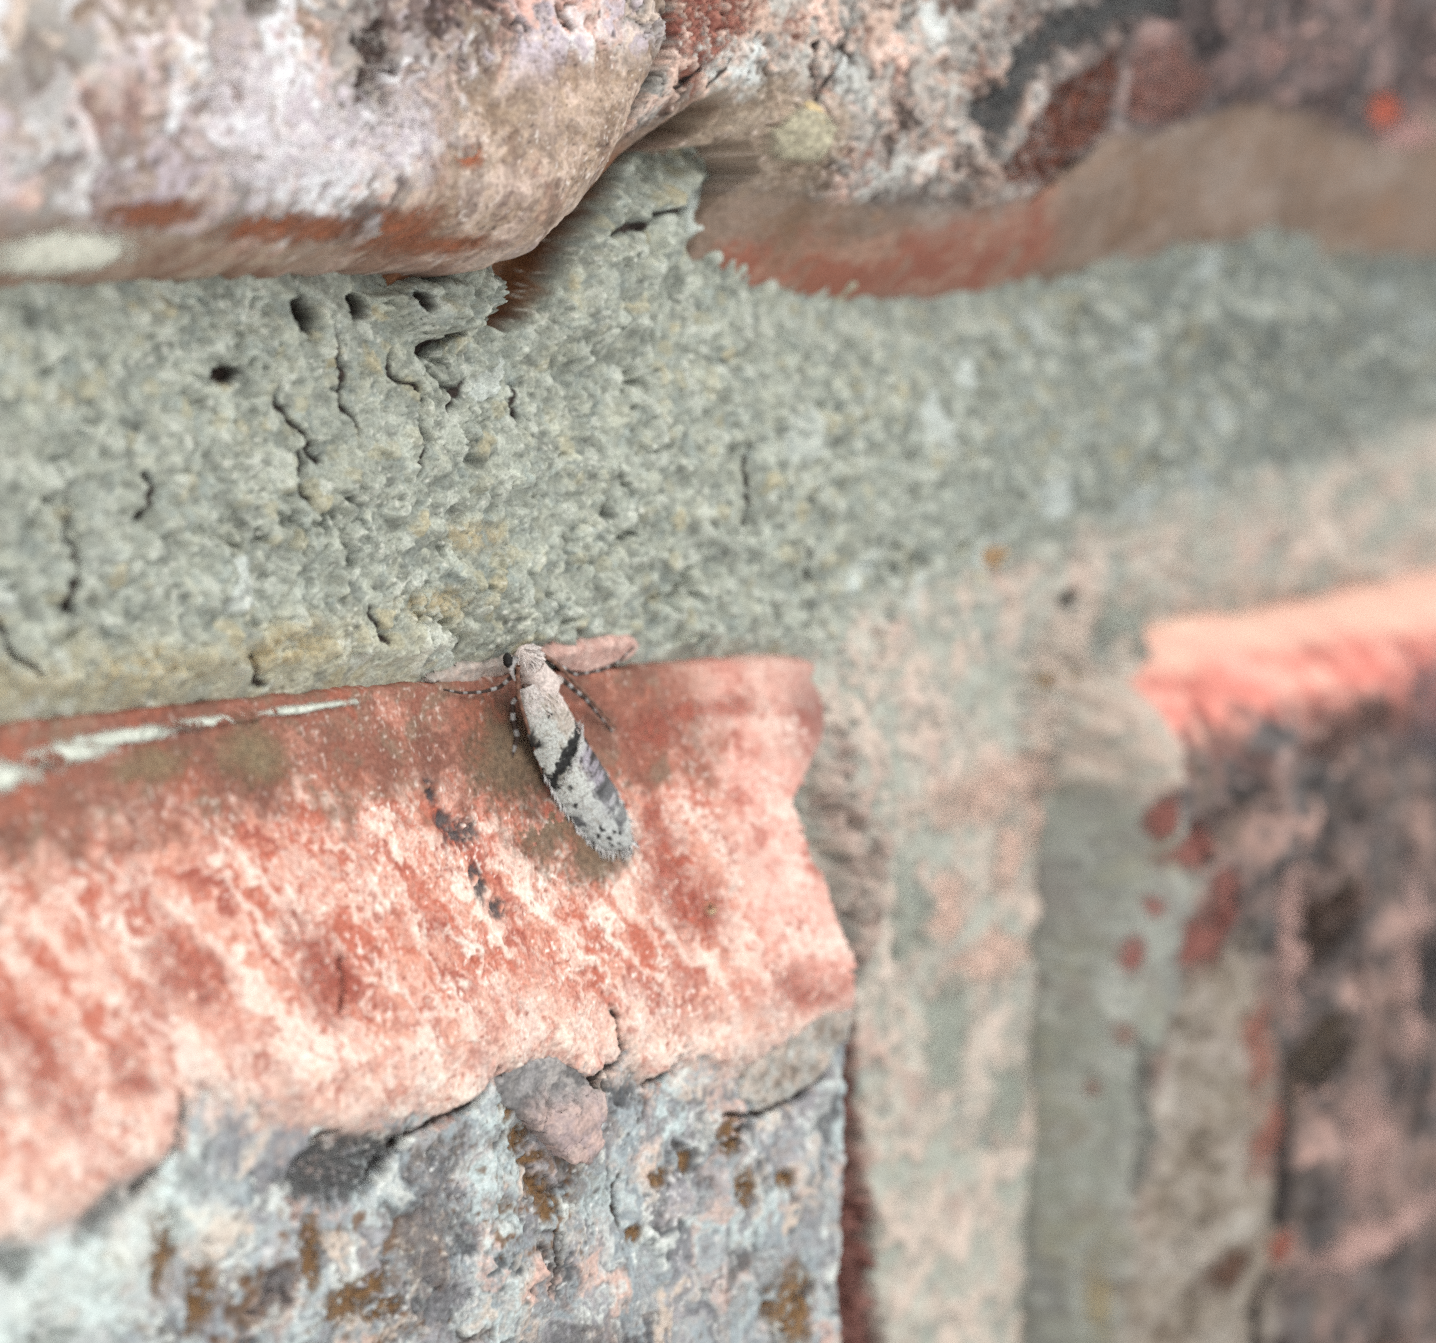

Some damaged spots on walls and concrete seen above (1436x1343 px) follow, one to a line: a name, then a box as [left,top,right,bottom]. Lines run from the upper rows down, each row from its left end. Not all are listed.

peeling [737,1010,853,1107]
peeling [493,1056,608,1165]
spalling [75,1169,151,1238]
spalling [285,1132,393,1202]